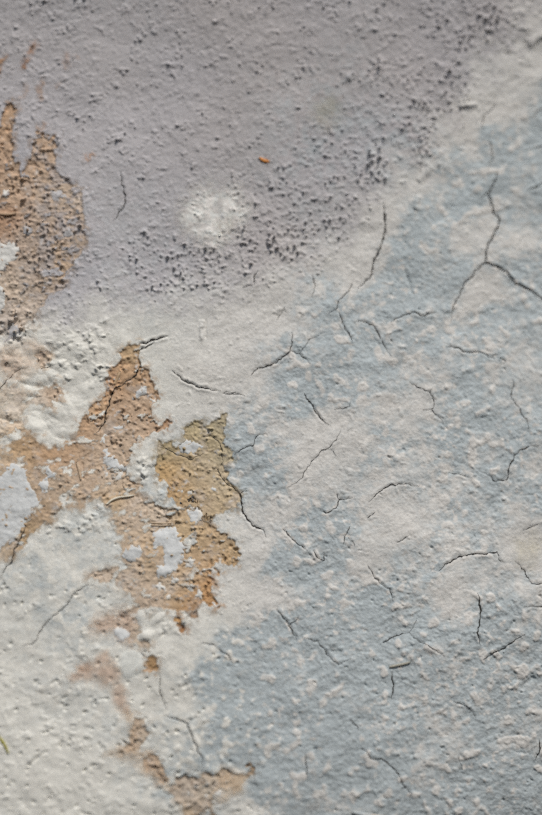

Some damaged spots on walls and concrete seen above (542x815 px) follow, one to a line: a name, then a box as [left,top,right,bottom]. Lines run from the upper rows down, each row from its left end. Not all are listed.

peeling [0,102,88,342]
crack [329,102,542,355]
crack [174,372,245,396]
crack [251,332,324,375]
crack [288,393,351,487]
crack [486,380,537,482]
peeling [0,344,241,673]
crack [166,433,325,561]
crack [440,551,542,585]
crack [477,592,521,659]
peeling [124,718,150,753]
peeling [143,753,255,815]